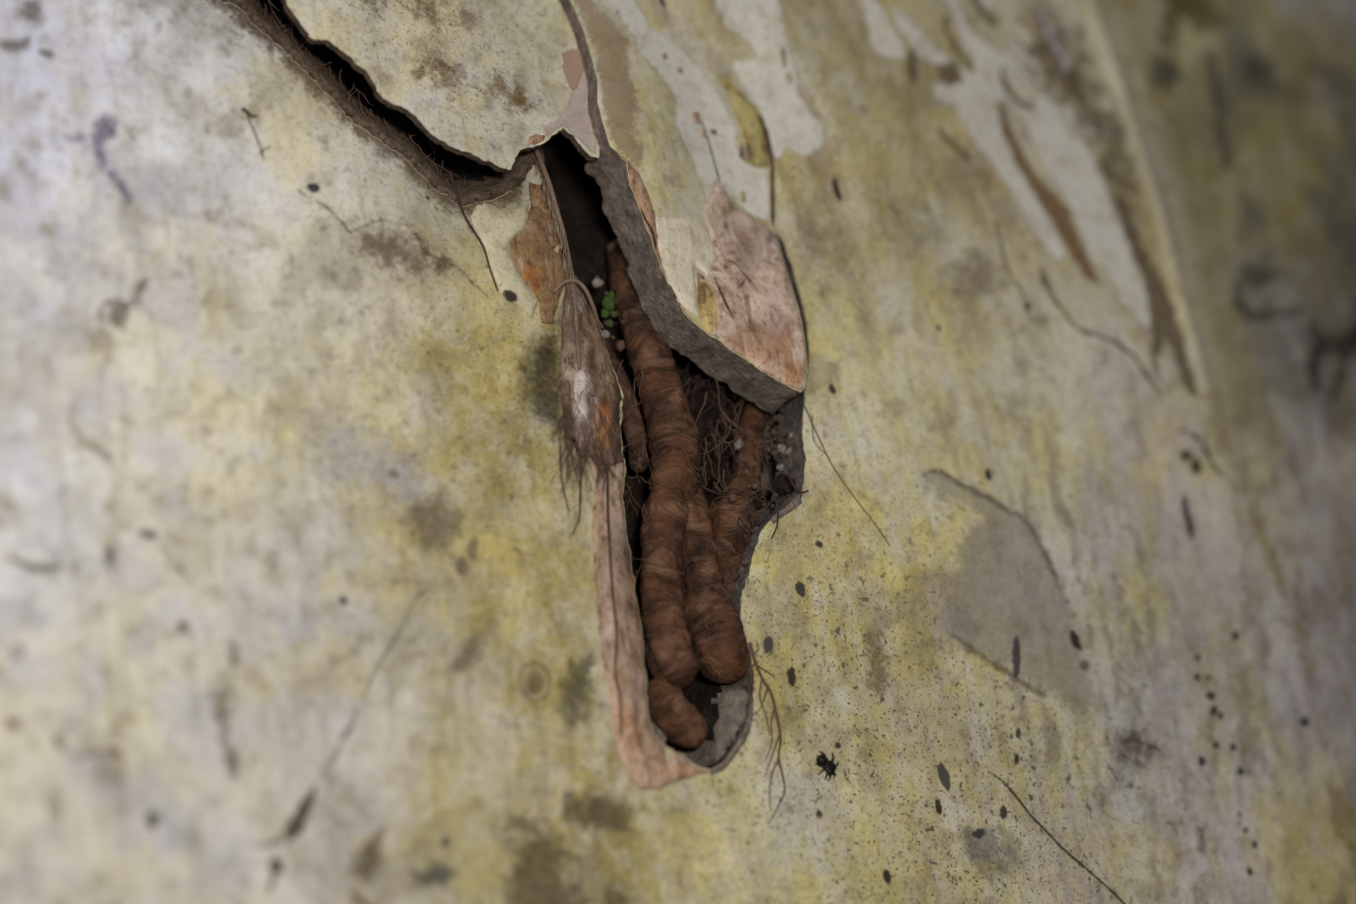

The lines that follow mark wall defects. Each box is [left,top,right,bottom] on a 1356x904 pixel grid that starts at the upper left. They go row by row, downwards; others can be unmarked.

crack [211,0,563,215]
spalling [281,0,510,174]
peeling [861,0,1152,337]
spalling [470,0,824,790]